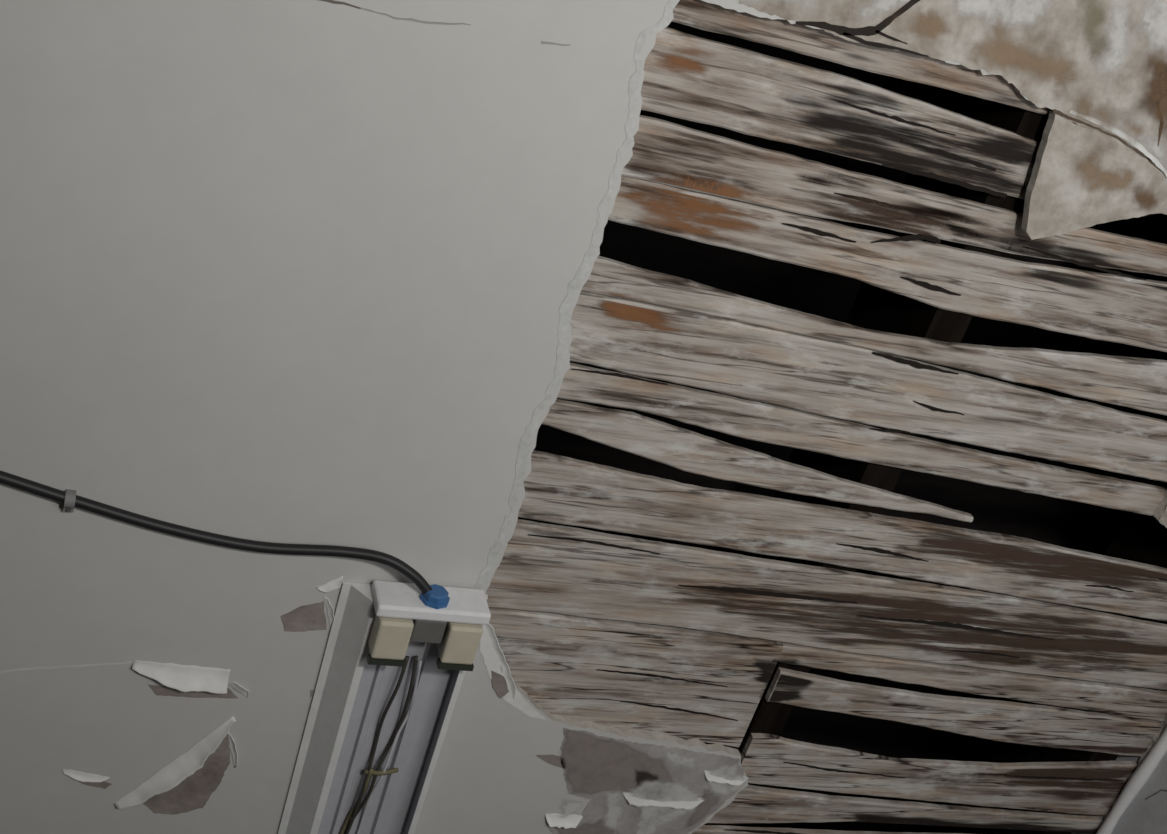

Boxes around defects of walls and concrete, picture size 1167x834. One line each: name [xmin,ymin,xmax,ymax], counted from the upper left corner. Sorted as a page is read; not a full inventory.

crack [796,0,928,57]
flaking render [739,0,1167,240]
peeling [474,0,679,589]
peeling [281,576,343,632]
peeling [132,660,249,699]
peeling [480,623,546,720]
peeling [62,769,112,789]
peeling [113,716,238,815]
peeling [536,728,748,834]